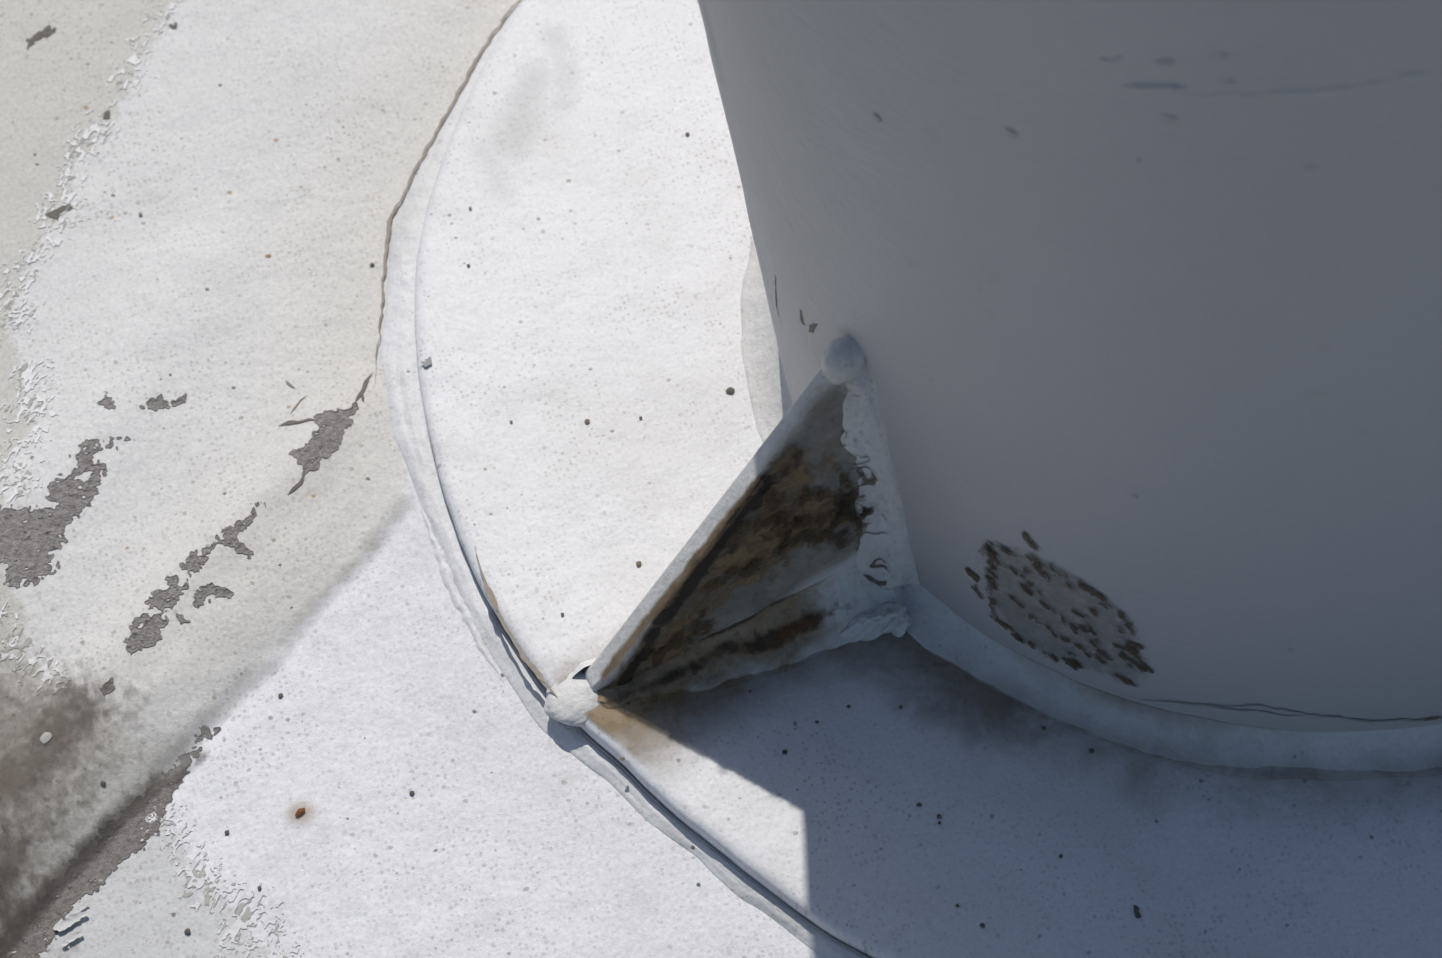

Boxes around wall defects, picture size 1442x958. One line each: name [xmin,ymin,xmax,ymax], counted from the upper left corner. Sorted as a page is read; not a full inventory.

peeling [0,0,187,695]
peeling [289,402,359,476]
peeling [123,501,266,655]